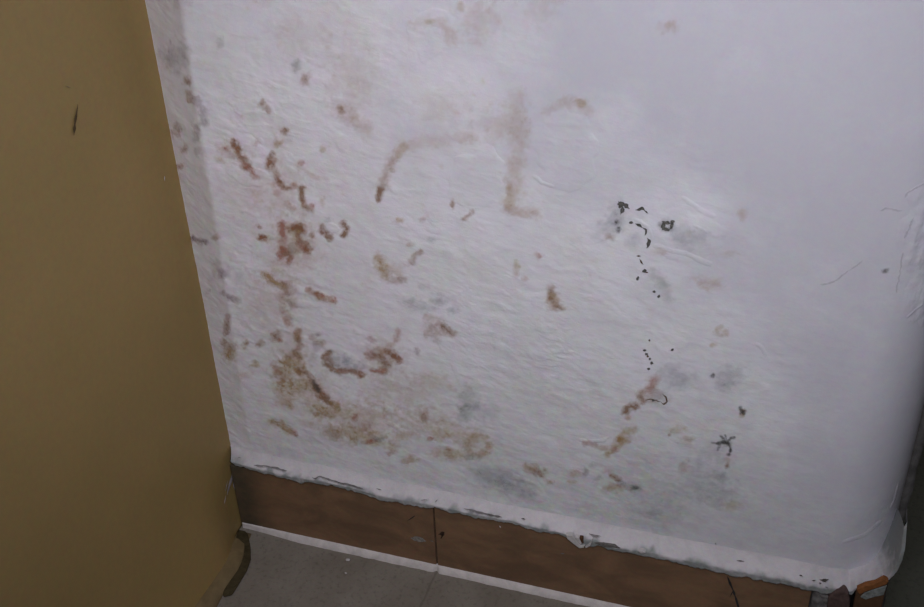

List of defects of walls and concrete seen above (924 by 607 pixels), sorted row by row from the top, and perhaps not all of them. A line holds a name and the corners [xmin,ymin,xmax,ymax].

flaking render [566,532,620,548]